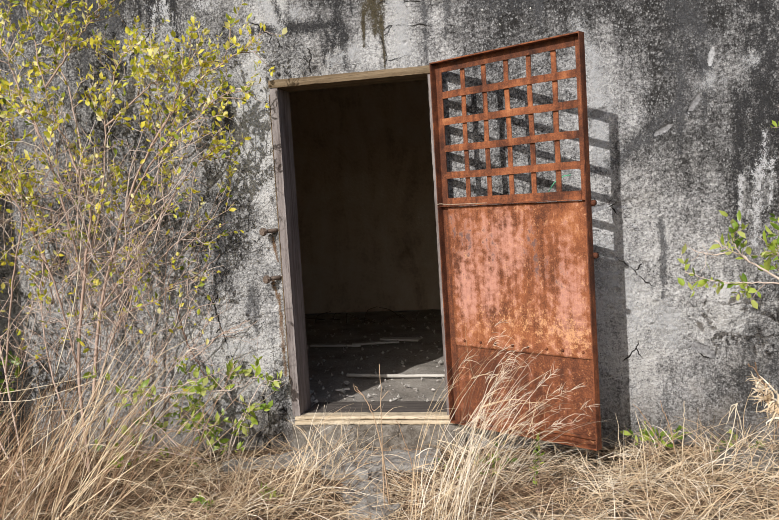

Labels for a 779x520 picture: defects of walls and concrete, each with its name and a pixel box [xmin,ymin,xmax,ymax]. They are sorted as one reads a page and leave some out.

leakage [249,0,367,69]
leakage [377,13,386,69]
leakage [591,0,717,176]
leakage [724,0,779,252]
crack [616,257,657,288]